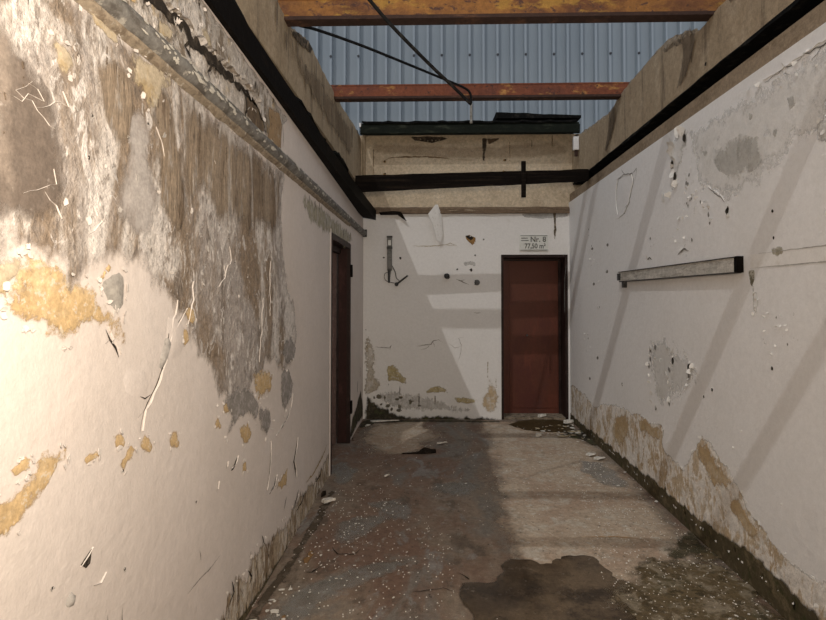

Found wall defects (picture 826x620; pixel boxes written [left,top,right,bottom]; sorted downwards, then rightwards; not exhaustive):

crack [146,0,284,141]
spalling [291,31,313,53]
crack [746,39,826,93]
flaking render [661,51,826,225]
flaking render [0,0,296,438]
peeling [385,361,406,385]
spalling [645,342,696,410]
peeling [0,443,71,536]
damp [239,491,334,620]
damp [562,413,819,620]
flaking render [571,385,826,620]